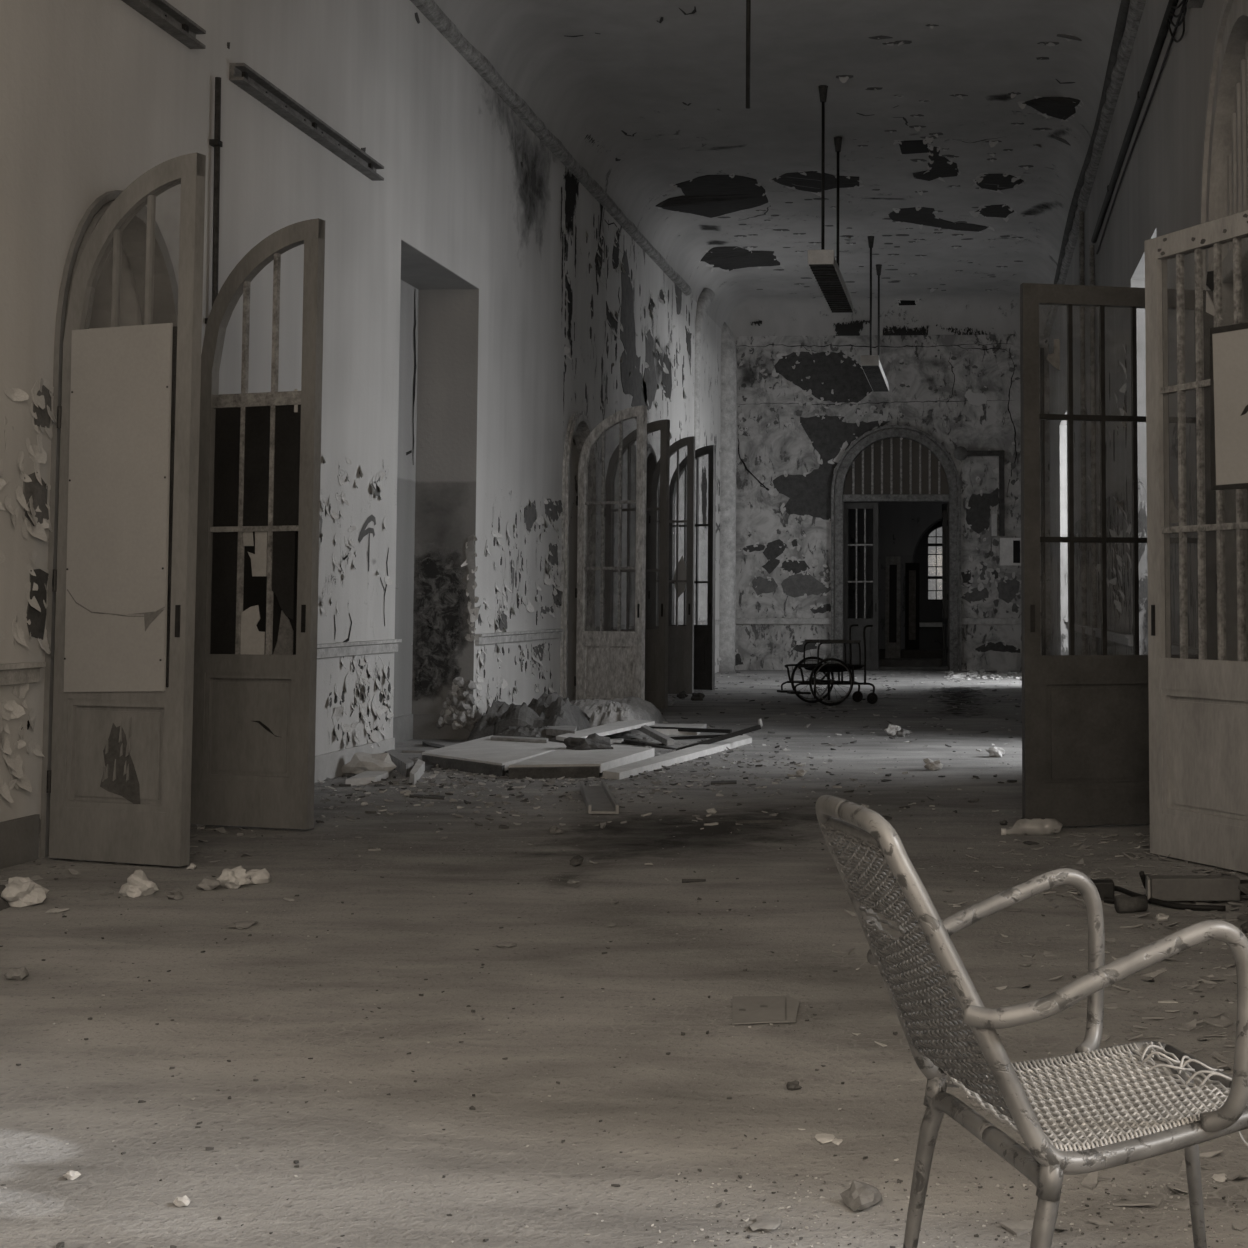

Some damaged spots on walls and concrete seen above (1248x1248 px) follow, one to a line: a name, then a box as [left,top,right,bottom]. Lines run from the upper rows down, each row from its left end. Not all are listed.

leakage [512,131,544,224]
flaking render [656,170,880,272]
flaking render [859,100,1034,283]
flaking render [1008,92,1084,147]
peeling [563,216,693,436]
peeling [0,378,56,654]
peeling [320,456,386,580]
peeling [328,654,394,748]
peeling [461,494,564,710]
flaking render [738,349,904,616]
flaking render [961,442,1021,613]
flaking render [976,640,1020,655]